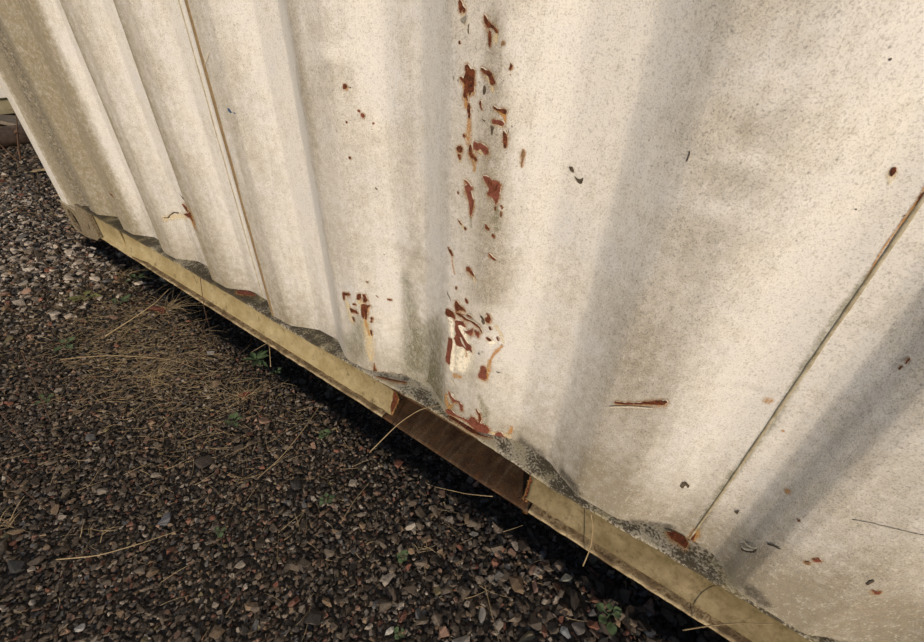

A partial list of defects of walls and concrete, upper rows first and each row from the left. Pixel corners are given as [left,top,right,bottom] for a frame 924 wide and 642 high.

peeling [458,0,470,34]
peeling [483,14,505,48]
peeling [453,63,512,218]
peeling [457,178,475,230]
peeling [445,297,503,381]
corrosion [666,531,698,550]